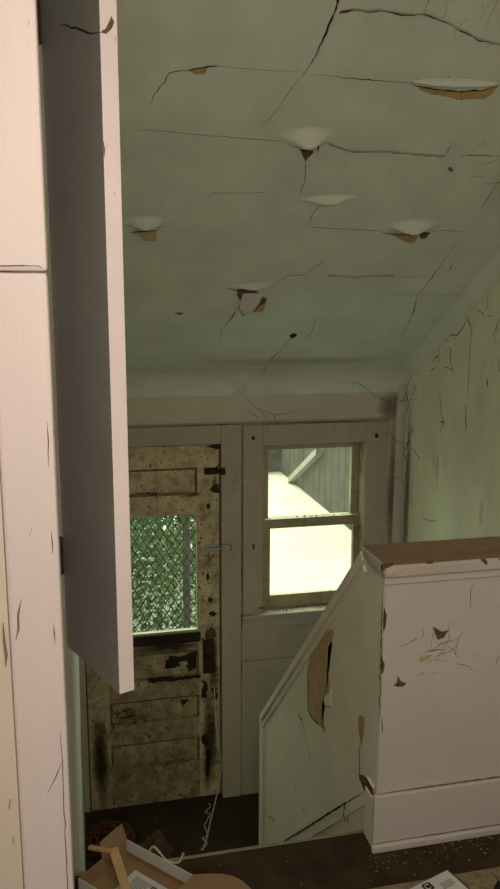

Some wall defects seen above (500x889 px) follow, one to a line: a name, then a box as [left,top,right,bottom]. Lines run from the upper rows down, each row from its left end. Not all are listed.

crack [60,24,100,34]
flaking render [188,65,216,74]
crack [148,0,500,142]
flaking render [411,77,500,100]
crack [300,142,500,231]
flaking render [130,230,157,241]
flaking render [382,232,430,243]
flaking render [227,288,267,316]
crack [403,355,439,525]
flaking render [307,629,334,733]
spalling [359,775,374,795]